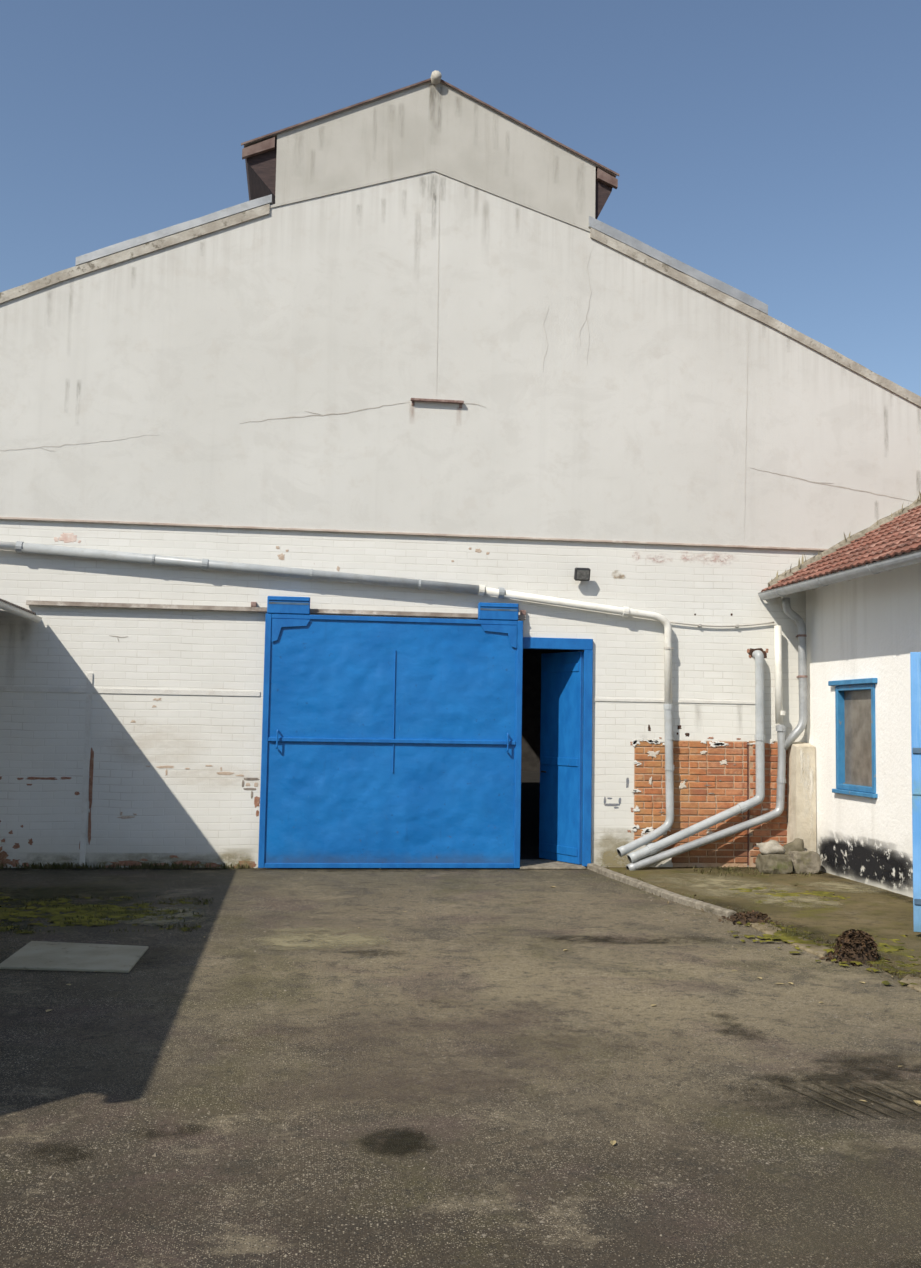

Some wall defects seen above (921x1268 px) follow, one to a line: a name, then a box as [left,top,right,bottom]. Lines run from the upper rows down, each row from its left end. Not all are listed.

crack [239,393,437,424]
crack [0,435,155,451]
crack [744,357,914,542]
peeling [17,748,94,849]
spalling [205,765,260,817]
flaking render [627,725,787,867]
spalling [0,820,33,867]